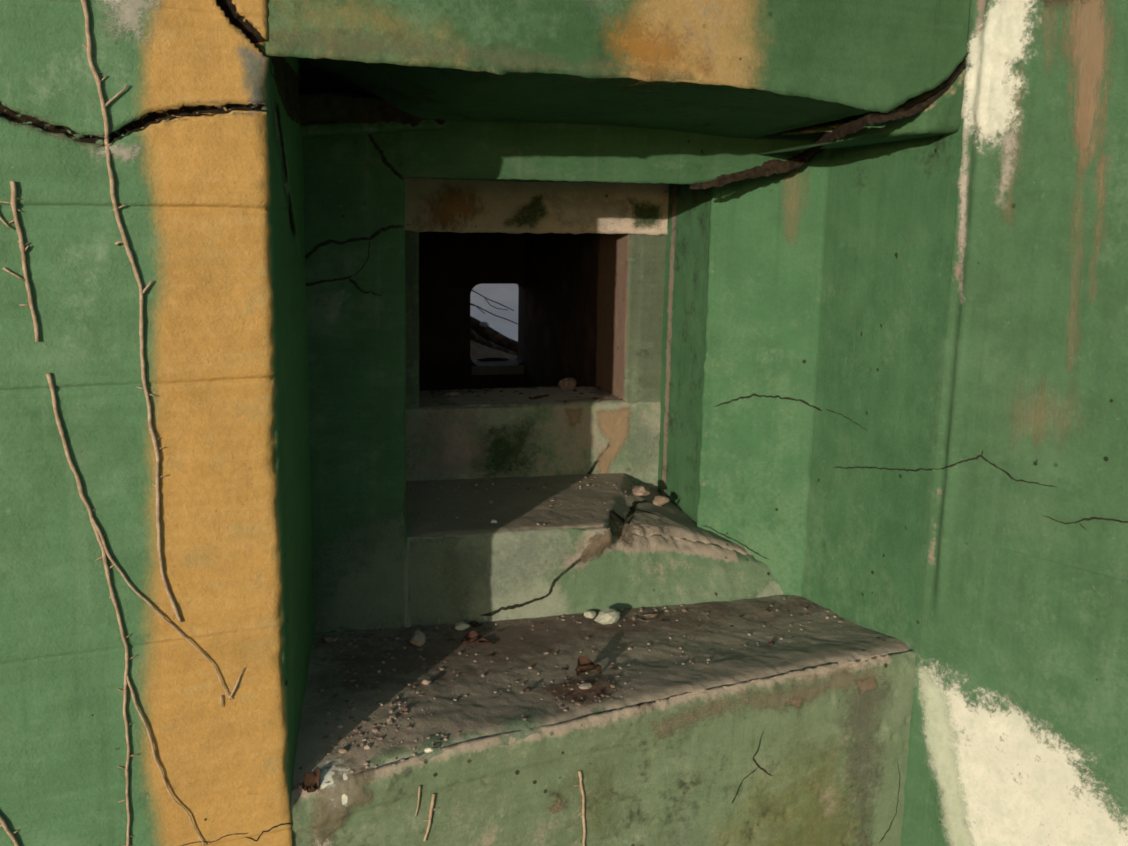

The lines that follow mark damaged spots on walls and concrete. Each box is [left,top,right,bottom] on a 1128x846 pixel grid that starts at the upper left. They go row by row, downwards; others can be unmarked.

damp [104,0,155,37]
crack [217,0,267,43]
crack [0,101,268,147]
crack [690,61,966,189]
damp [959,0,1056,296]
rust [1066,0,1109,200]
damp [427,386,608,474]
peeling [596,409,631,474]
crack [834,450,1056,487]
crack [481,555,585,616]
damp [918,661,1128,846]
crack [181,822,293,846]